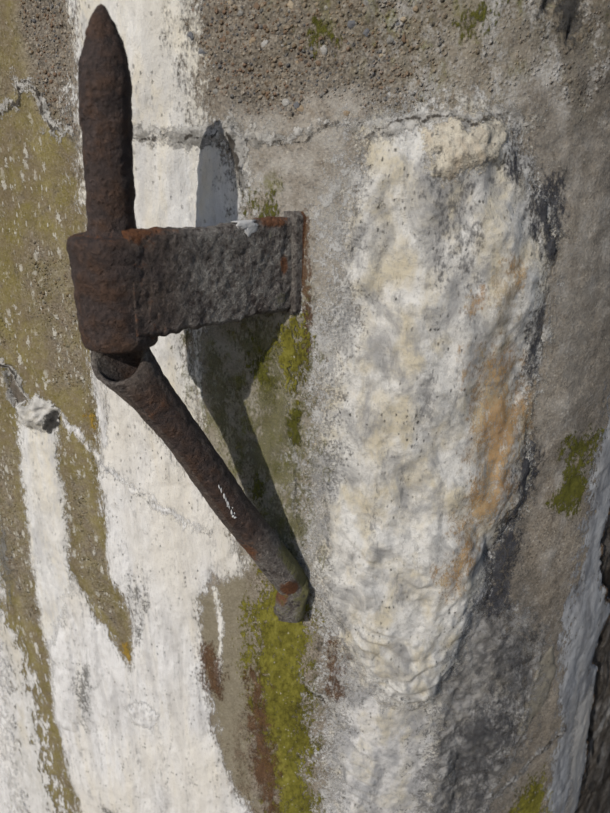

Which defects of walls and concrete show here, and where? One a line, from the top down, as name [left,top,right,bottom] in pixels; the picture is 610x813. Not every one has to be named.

spalling [534,0,593,48]
crack [0,66,77,145]
corrosion [302,211,313,364]
crack [0,357,30,415]
leakage [277,121,610,813]
corrosion [198,640,229,701]
corrosion [241,665,287,813]